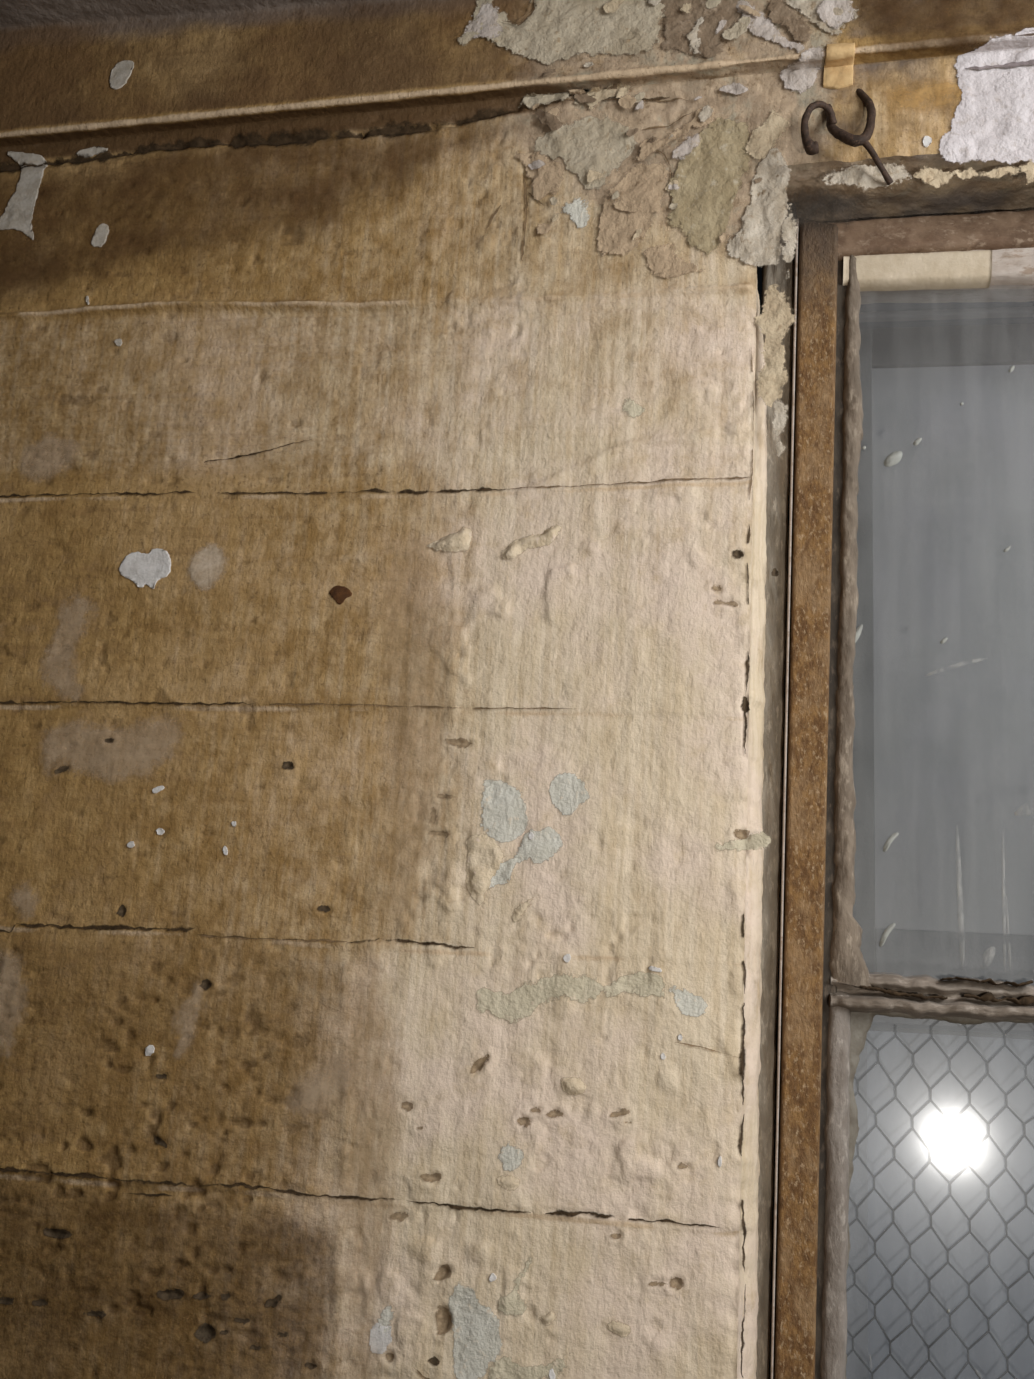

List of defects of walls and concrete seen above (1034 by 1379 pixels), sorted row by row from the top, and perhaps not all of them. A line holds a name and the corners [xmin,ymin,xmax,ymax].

peeling [458,0,859,94]
peeling [823,28,1034,190]
peeling [0,151,48,240]
damp [0,144,361,287]
damp [790,189,855,226]
crack [0,353,754,604]
peeling [119,548,171,589]
damp [189,545,224,590]
damp [46,722,177,780]
crack [0,923,474,949]
crack [676,914,746,1156]
crack [0,1167,747,1378]